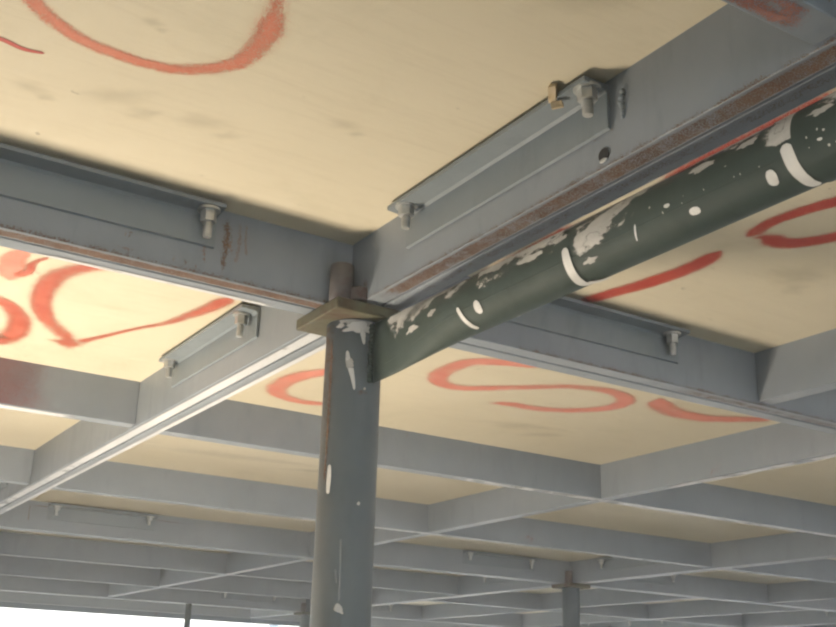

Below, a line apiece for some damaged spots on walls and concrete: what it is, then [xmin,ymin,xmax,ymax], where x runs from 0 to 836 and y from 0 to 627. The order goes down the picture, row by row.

peeling [807,91,836,117]
rust [368,36,836,299]
rust [0,220,327,308]
peeling [388,112,796,336]
peeling [336,319,373,344]